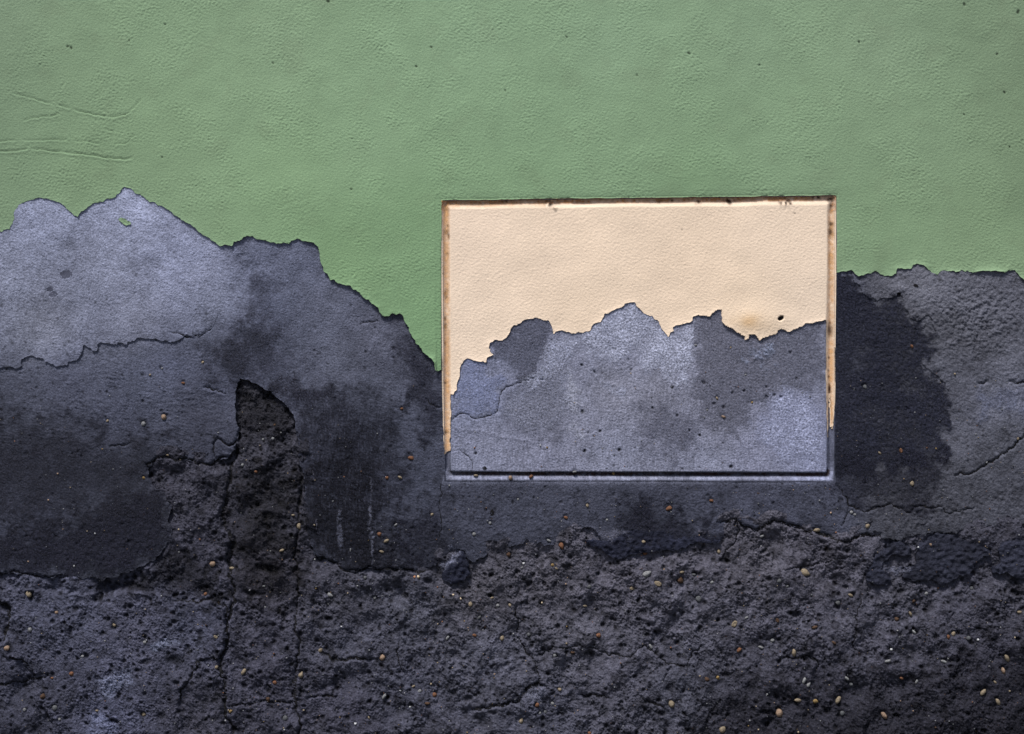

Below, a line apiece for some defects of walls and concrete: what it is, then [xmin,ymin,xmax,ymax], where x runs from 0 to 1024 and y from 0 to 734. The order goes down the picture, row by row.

water stain [0,427,223,612]
crack [146,430,428,734]
water stain [225,318,456,571]
flaking render [0,187,1024,734]
water stain [758,274,952,515]
crack [955,436,1024,476]